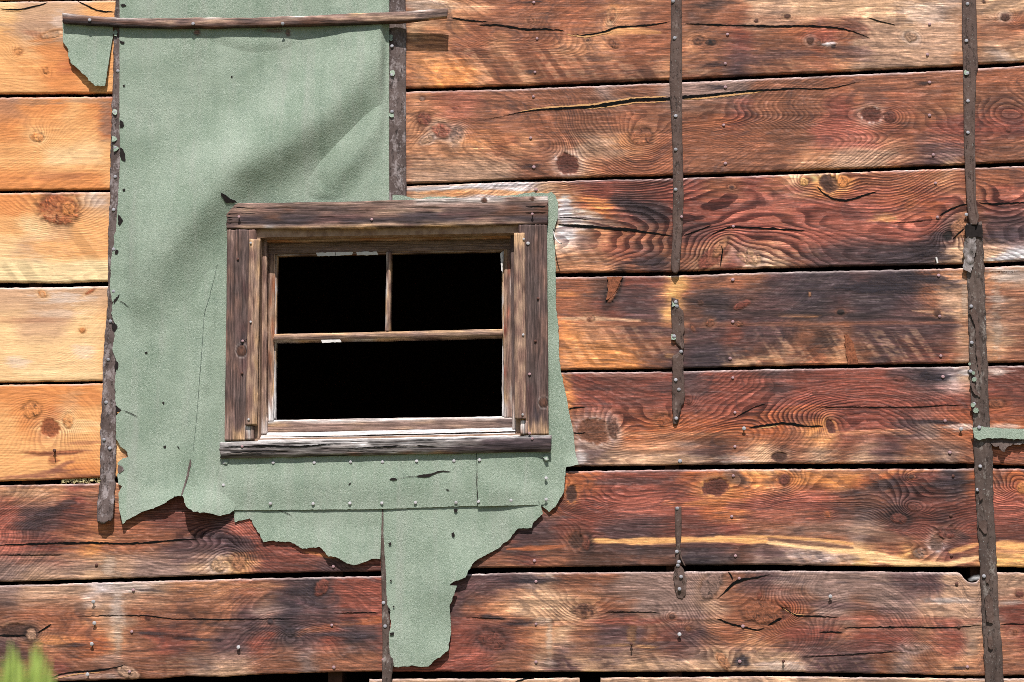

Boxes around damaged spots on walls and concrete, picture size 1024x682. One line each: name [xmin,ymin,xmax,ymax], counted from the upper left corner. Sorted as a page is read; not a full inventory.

crack [453,17,894,38]
crack [477,80,865,121]
crack [817,186,877,201]
crack [895,202,1024,239]
crack [735,404,956,429]
crack [717,572,1021,657]